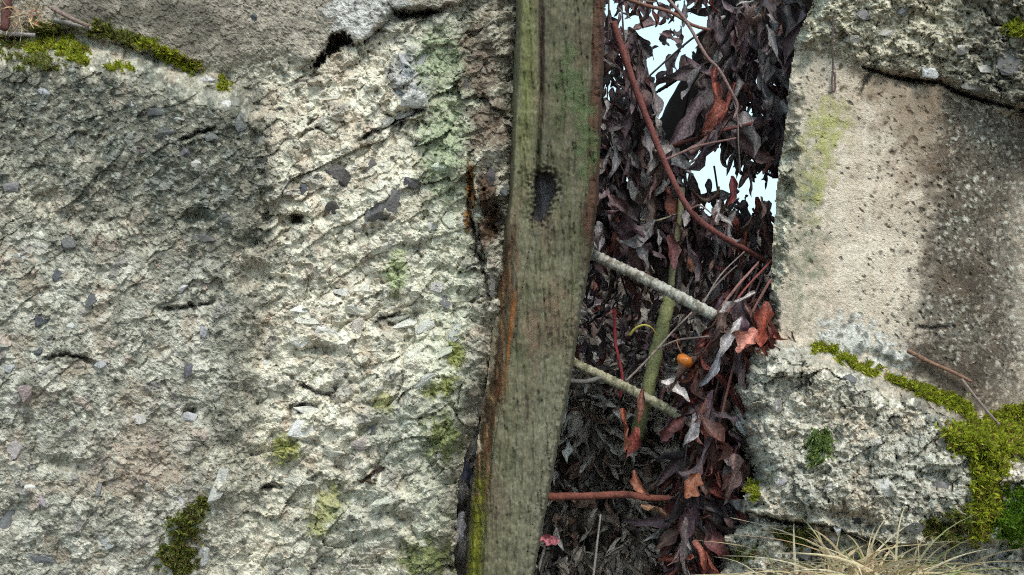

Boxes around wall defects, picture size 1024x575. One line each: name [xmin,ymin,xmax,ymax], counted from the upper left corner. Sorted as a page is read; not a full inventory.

corrosion [464,165,498,250]
damp [817,87,1024,415]